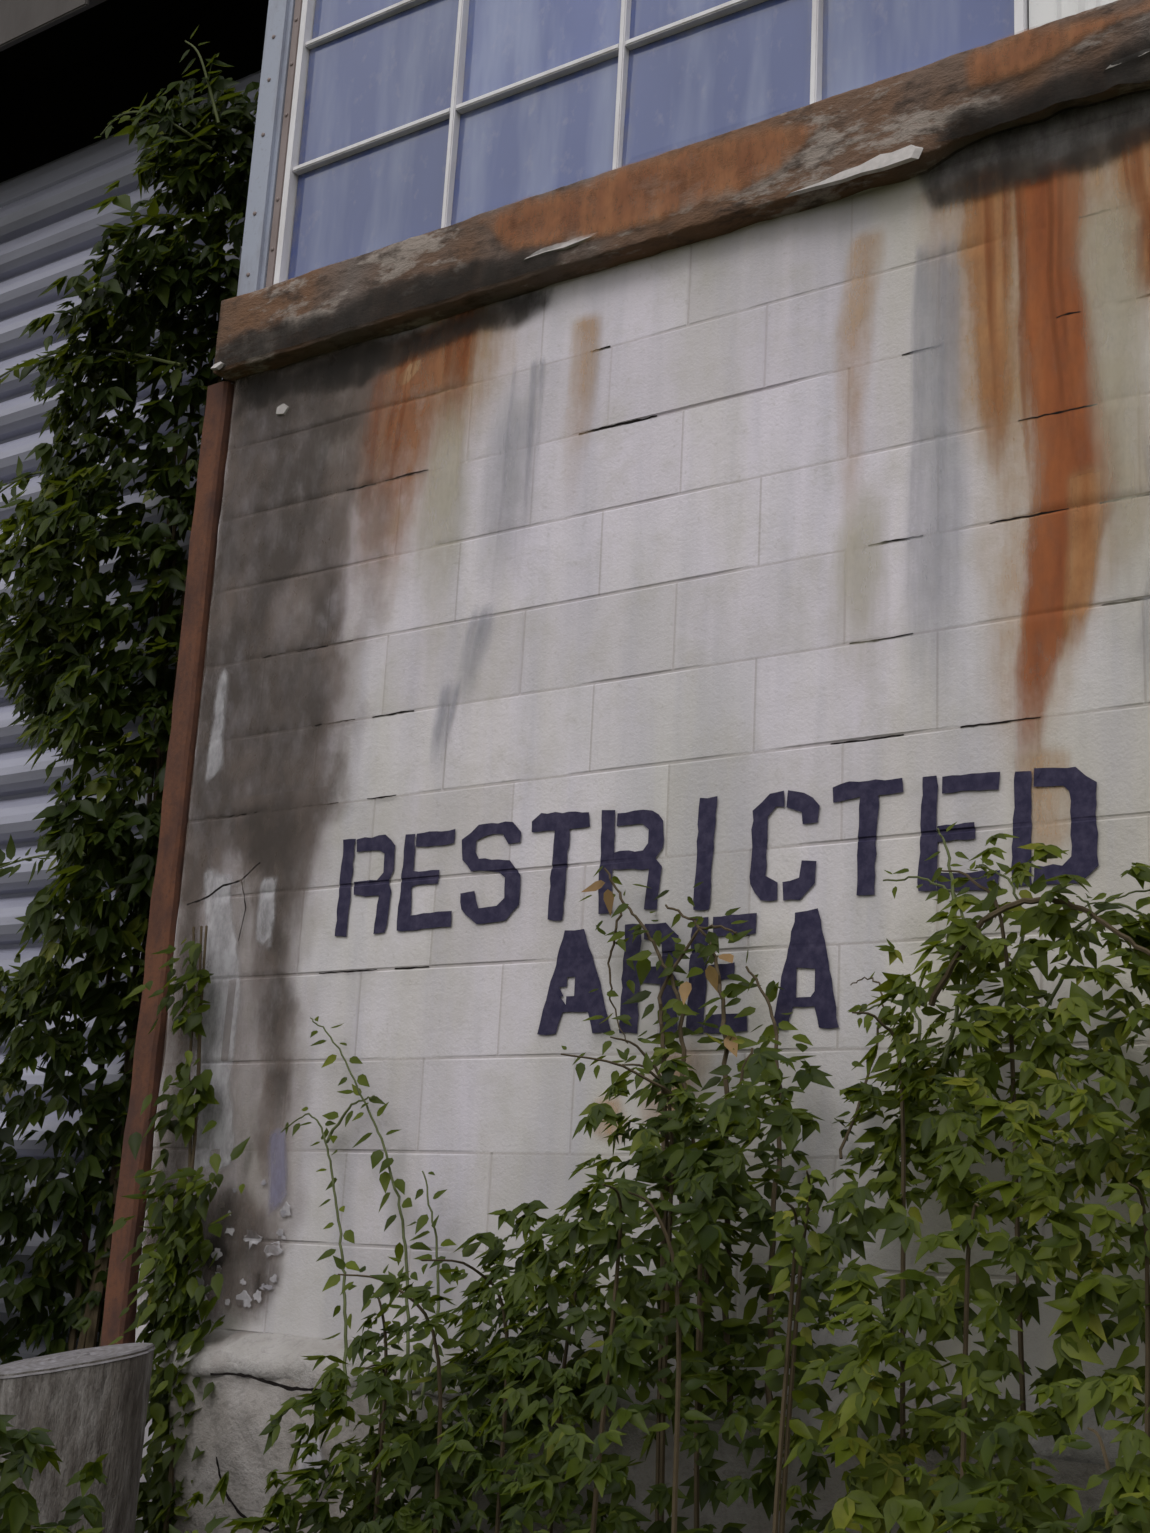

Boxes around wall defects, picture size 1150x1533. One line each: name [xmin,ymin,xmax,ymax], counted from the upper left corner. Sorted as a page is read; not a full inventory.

rust [969,18,1114,82]
rust [495,127,808,247]
rust [1110,139,1150,278]
leakage [214,252,557,367]
leakage [241,292,546,406]
rust [361,307,484,496]
rust [950,167,1116,710]
peeling [191,1188,291,1319]